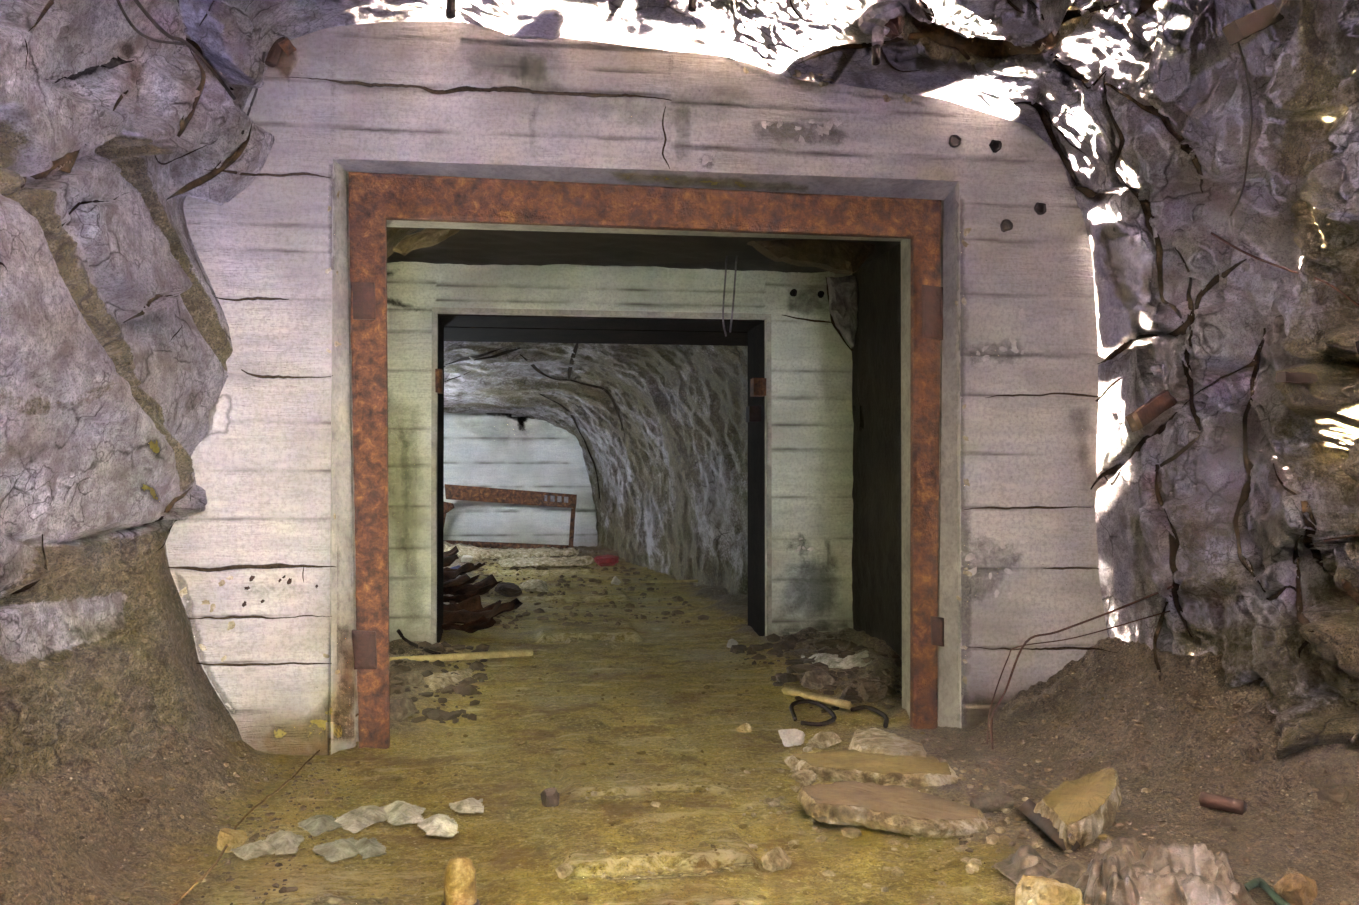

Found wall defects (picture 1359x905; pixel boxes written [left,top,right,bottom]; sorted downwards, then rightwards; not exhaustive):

crack [265,76,672,169]
rust [442,546,523,633]
water stain [790,566,833,631]